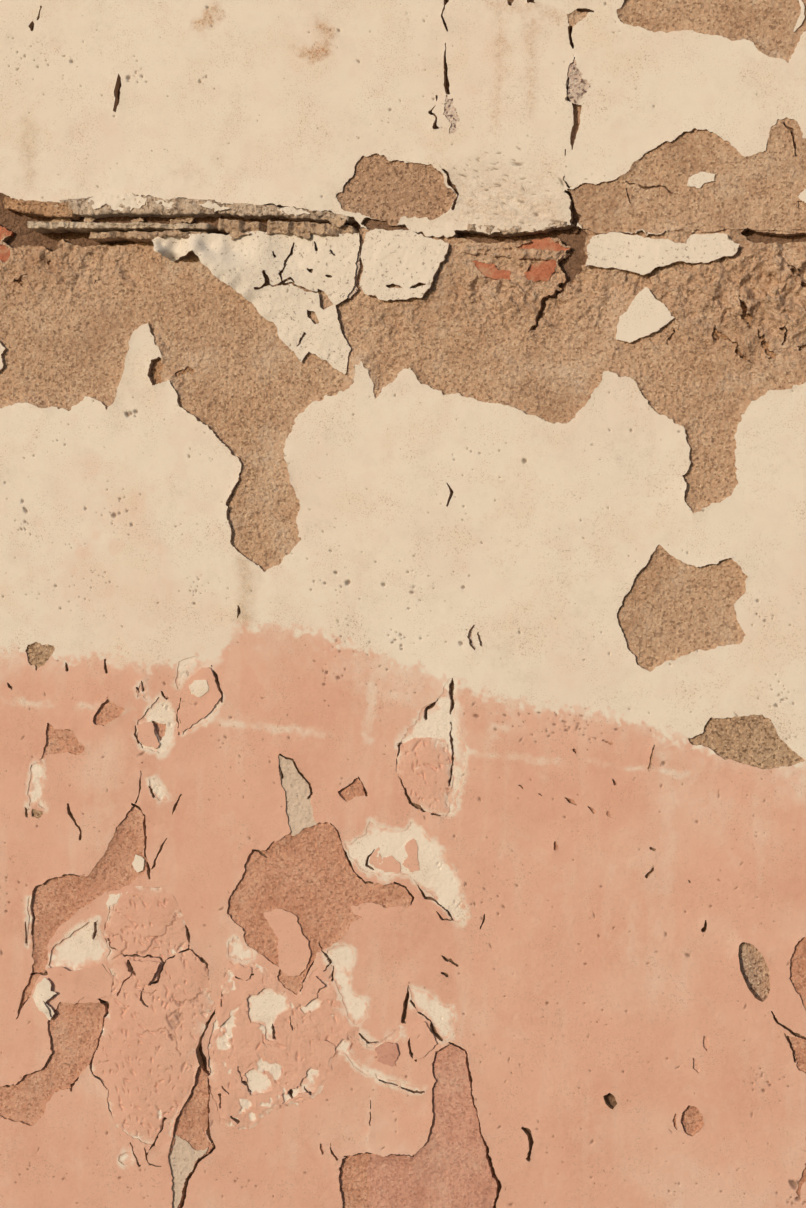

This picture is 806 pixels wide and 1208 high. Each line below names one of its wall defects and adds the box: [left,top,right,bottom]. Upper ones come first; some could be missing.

spalling [617,0,806,63]
crack [430,63,460,134]
crack [565,10,591,148]
crack [443,170,459,210]
spalling [0,118,806,571]
spalling [617,545,748,672]
spalling [688,714,805,769]
peeling [149,778,182,811]
spalling [0,804,165,1125]
peeling [208,754,502,1208]
spalling [790,937,806,1010]